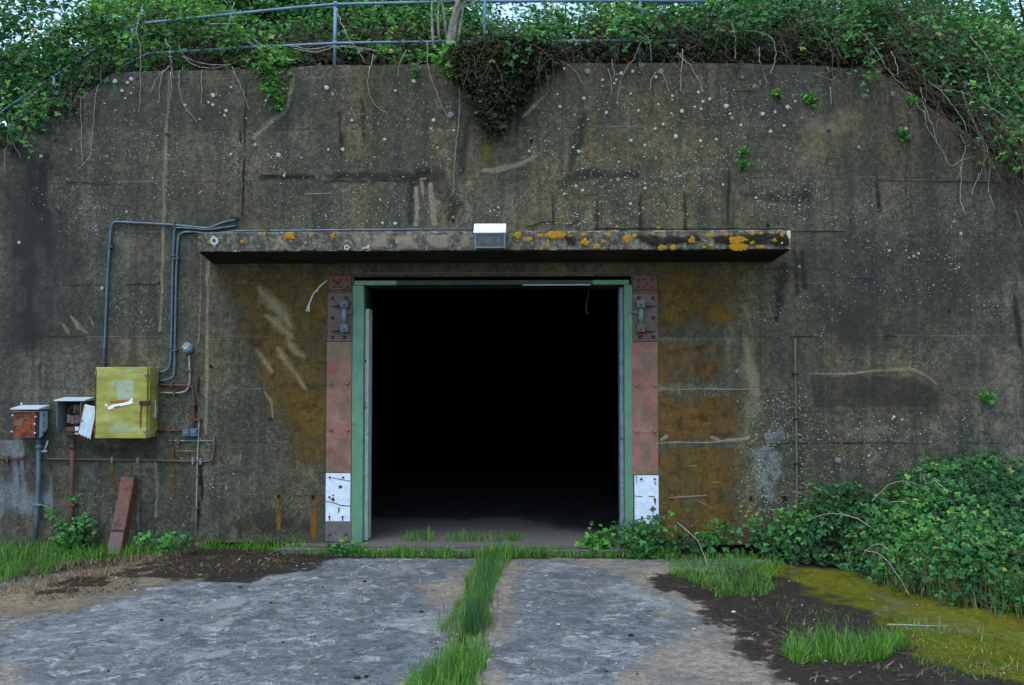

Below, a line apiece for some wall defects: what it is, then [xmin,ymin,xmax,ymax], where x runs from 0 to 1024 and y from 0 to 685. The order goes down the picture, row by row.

leakage [5,139,92,350]
leakage [328,168,458,223]
leakage [569,112,639,179]
corrosion [641,342,738,545]